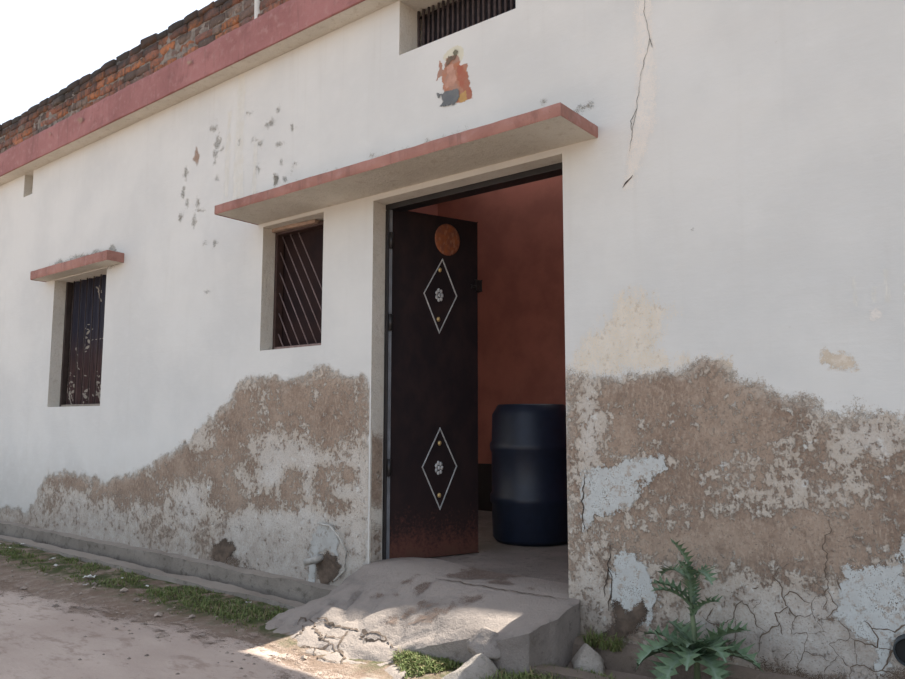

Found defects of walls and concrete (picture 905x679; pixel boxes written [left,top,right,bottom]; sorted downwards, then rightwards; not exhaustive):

crack [621,0,660,191]
flaking render [819,346,860,373]
flaking render [0,363,383,586]
crack [291,617,398,665]
flaking render [565,353,905,679]
crack [703,526,905,679]